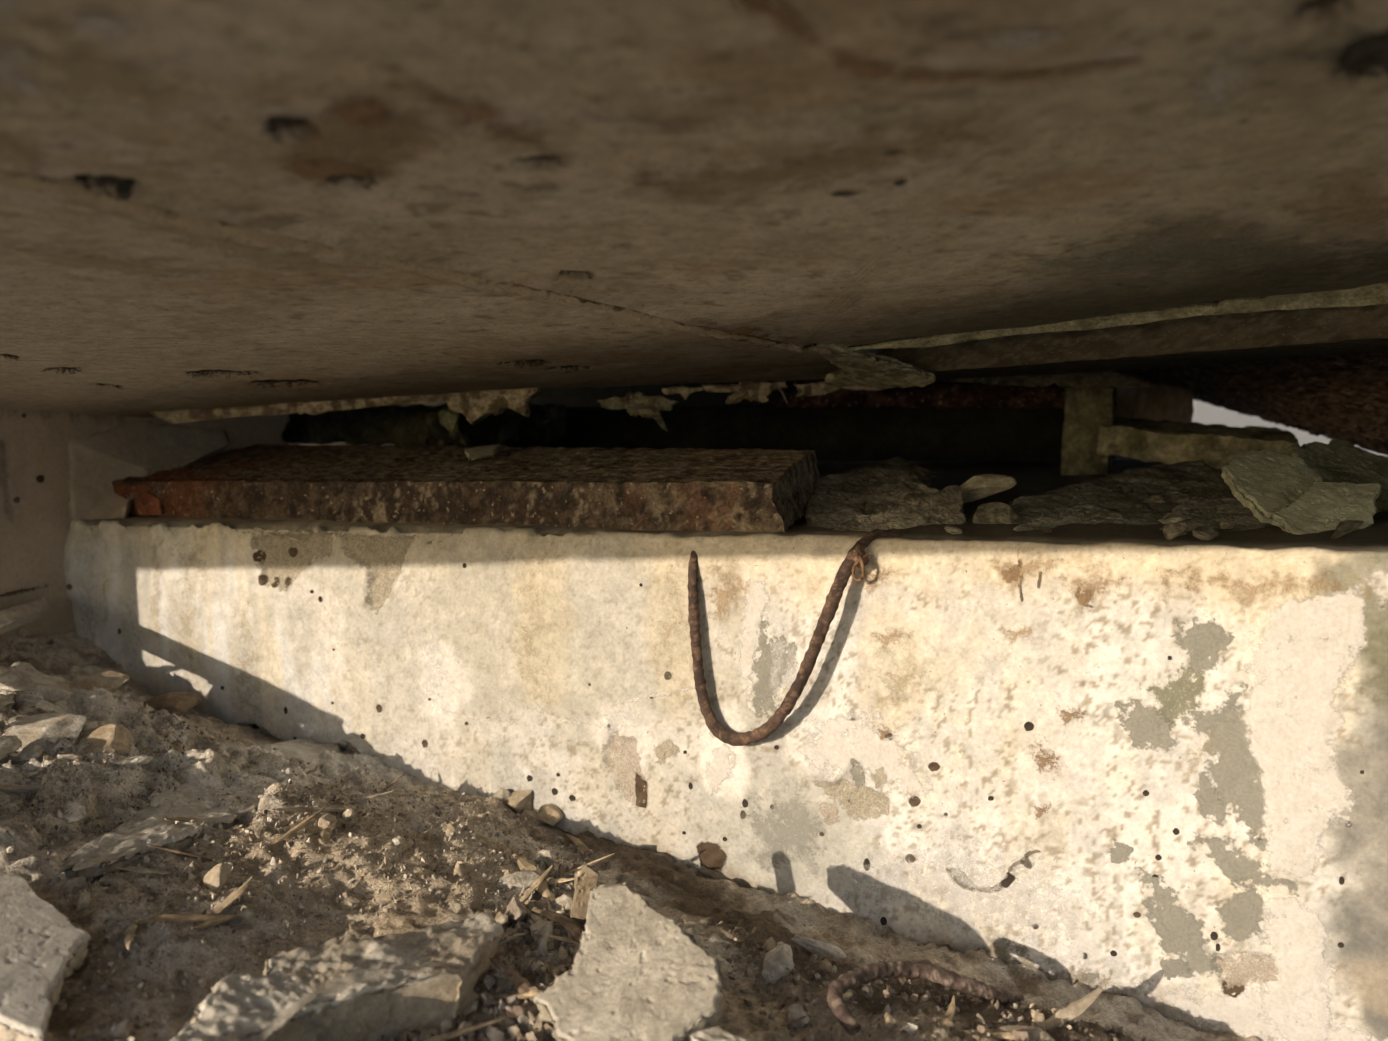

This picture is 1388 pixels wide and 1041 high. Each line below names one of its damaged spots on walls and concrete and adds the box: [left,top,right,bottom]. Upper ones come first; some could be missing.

crack [0,170,835,355]
peeling [637,408,668,432]
spalling [251,529,412,614]
rust [713,567,740,617]
peeling [1109,617,1299,998]
water stain [1241,570,1388,879]
water stain [886,841,1388,1041]